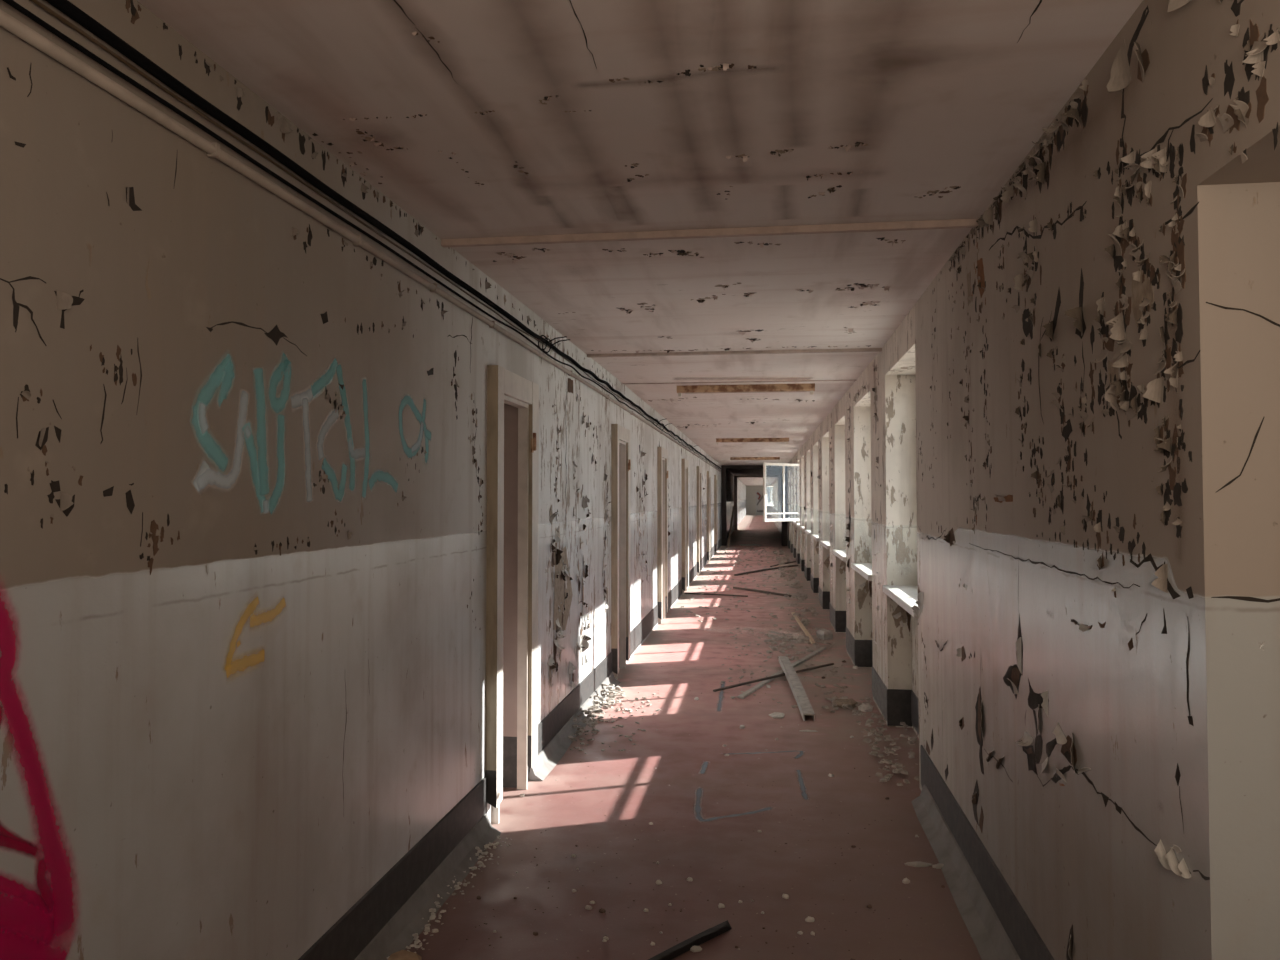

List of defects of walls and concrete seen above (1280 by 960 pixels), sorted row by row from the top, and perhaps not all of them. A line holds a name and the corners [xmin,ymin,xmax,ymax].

crack [989,201,1087,250]
crack [0,276,47,346]
crack [1206,302,1280,327]
peeling [90,337,142,444]
peeling [16,384,83,529]
crack [1216,417,1264,492]
peeling [545,384,611,690]
peeling [1071,619,1106,632]
crack [969,543,1280,726]
spalling [1003,607,1078,787]
spalling [959,688,1013,833]
crack [1075,763,1184,846]